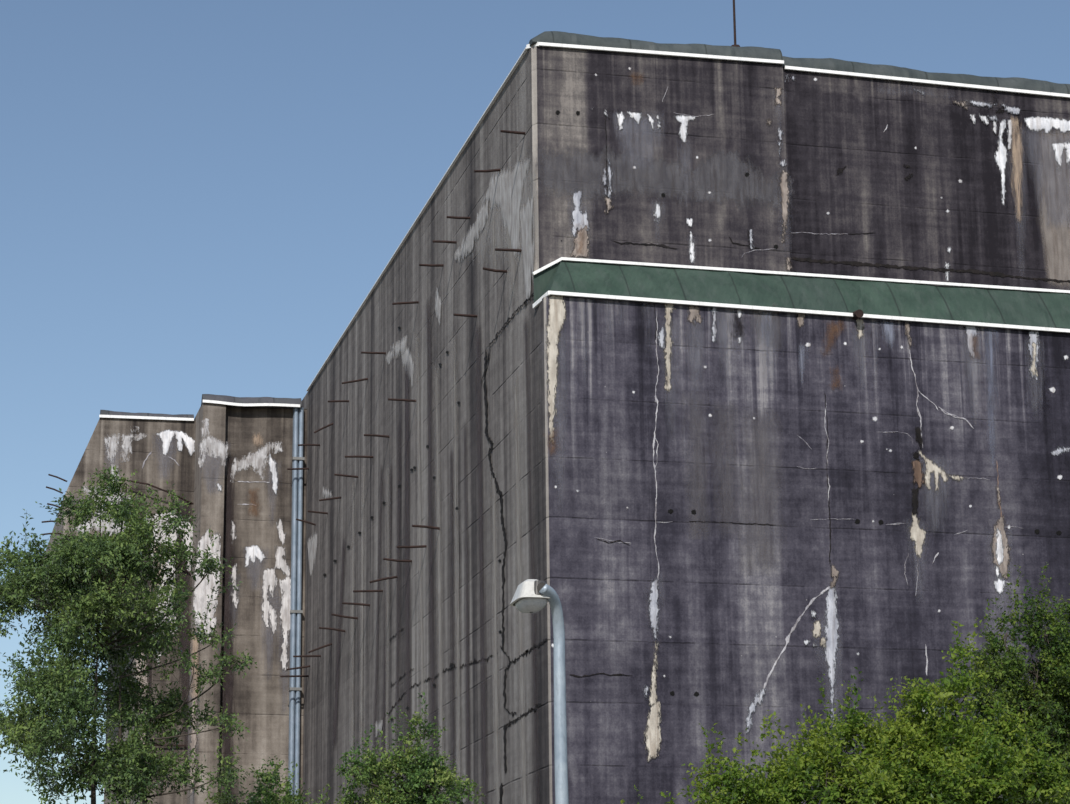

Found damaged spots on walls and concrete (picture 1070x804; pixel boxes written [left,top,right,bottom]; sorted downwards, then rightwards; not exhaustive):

damp [1040,132,1070,285]
peeling [73,418,282,536]
peeling [134,513,291,793]
damp [333,308,499,804]
crack [375,294,547,804]
damp [515,380,534,585]
damp [518,610,539,804]
crack [569,304,773,762]
crack [745,392,835,733]
crack [884,322,974,446]
spalling [904,427,964,596]
spalling [991,516,1011,594]